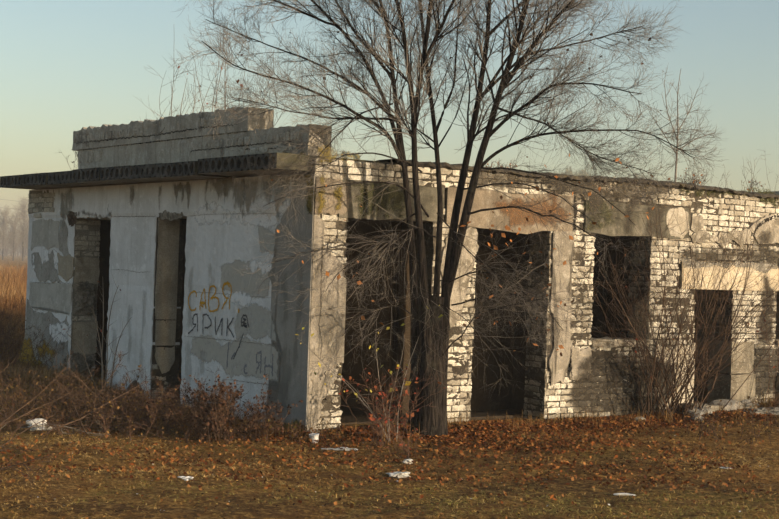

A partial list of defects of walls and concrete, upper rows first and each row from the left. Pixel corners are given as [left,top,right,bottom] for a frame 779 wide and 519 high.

water stain [206,174,292,219]
peeling [24,190,98,376]
peeling [190,226,278,380]